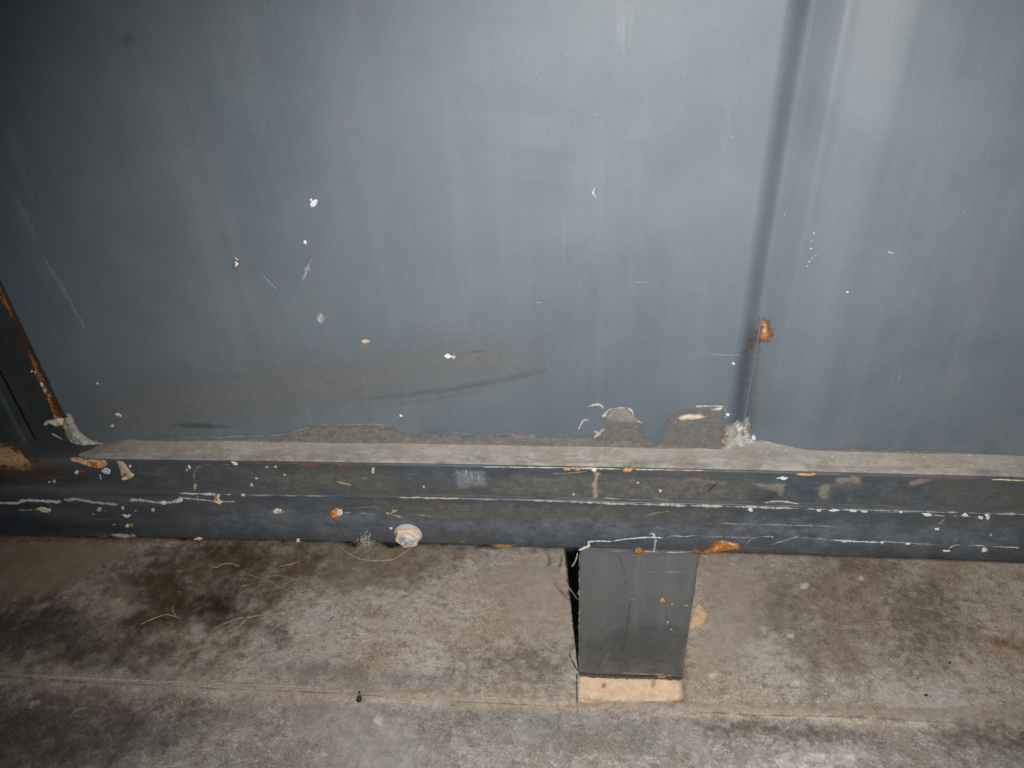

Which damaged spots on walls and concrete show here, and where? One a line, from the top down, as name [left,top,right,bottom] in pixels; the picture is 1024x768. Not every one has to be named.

rust [751,318,773,347]
peeling [44,413,102,445]
peeling [117,461,134,480]
peeling [757,477,798,504]
peeling [817,476,868,513]
peeling [330,508,343,519]
rust [689,539,743,554]
damp [0,534,442,671]